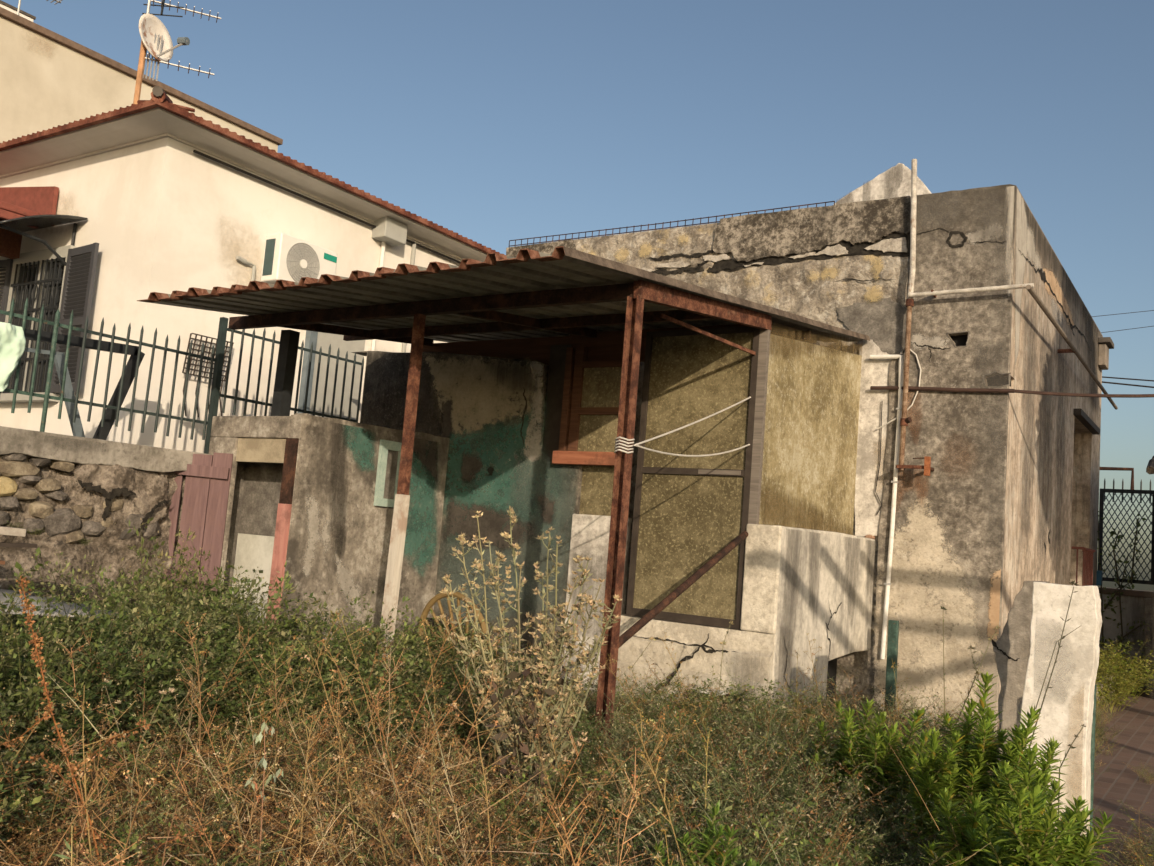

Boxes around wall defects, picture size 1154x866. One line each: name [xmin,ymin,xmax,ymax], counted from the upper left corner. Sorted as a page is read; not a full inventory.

crack [641,223,1092,351]
peeling [1043,268,1074,326]